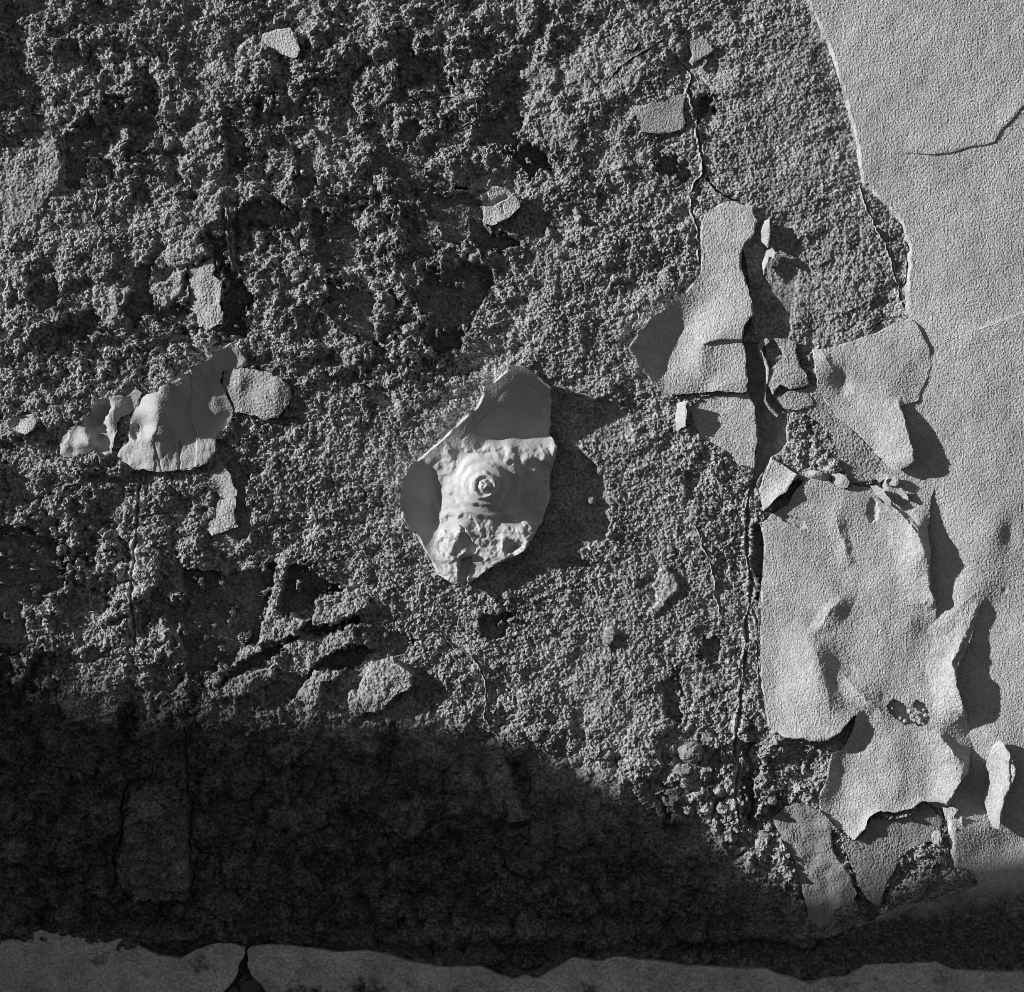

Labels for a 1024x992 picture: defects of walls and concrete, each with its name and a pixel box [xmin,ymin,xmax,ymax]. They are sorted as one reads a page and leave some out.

peeling [689,39,713,66]
spalling [652,155,691,183]
peeling [629,93,716,134]
crack [911,105,1024,157]
peeling [60,233,291,536]
peeling [629,201,932,511]
spalling [661,669,683,722]
spalling [696,636,720,663]
crack [693,486,762,828]
spalling [740,742,761,821]
peeling [983,740,1016,830]
peeling [773,803,962,930]